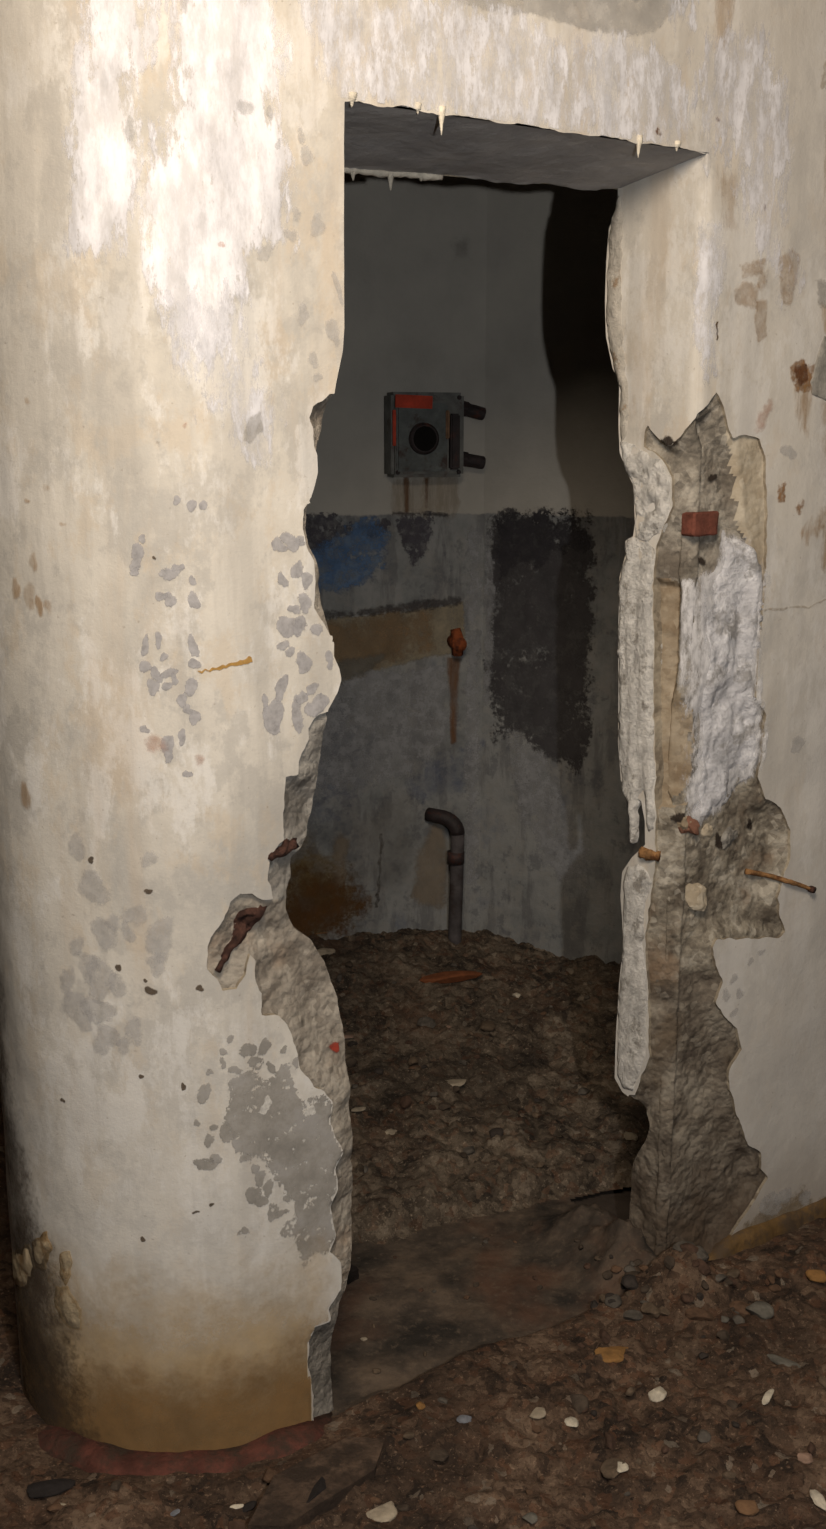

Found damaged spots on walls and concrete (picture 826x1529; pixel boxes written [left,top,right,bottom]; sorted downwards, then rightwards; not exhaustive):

water stain [64,0,300,467]
spalling [309,394,332,450]
water stain [301,0,799,269]
water stain [694,225,726,381]
corrosion [790,359,814,392]
peeling [483,507,598,775]
spalling [606,196,817,1255]
spalling [181,504,466,1418]
water stain [6,1117,314,1452]